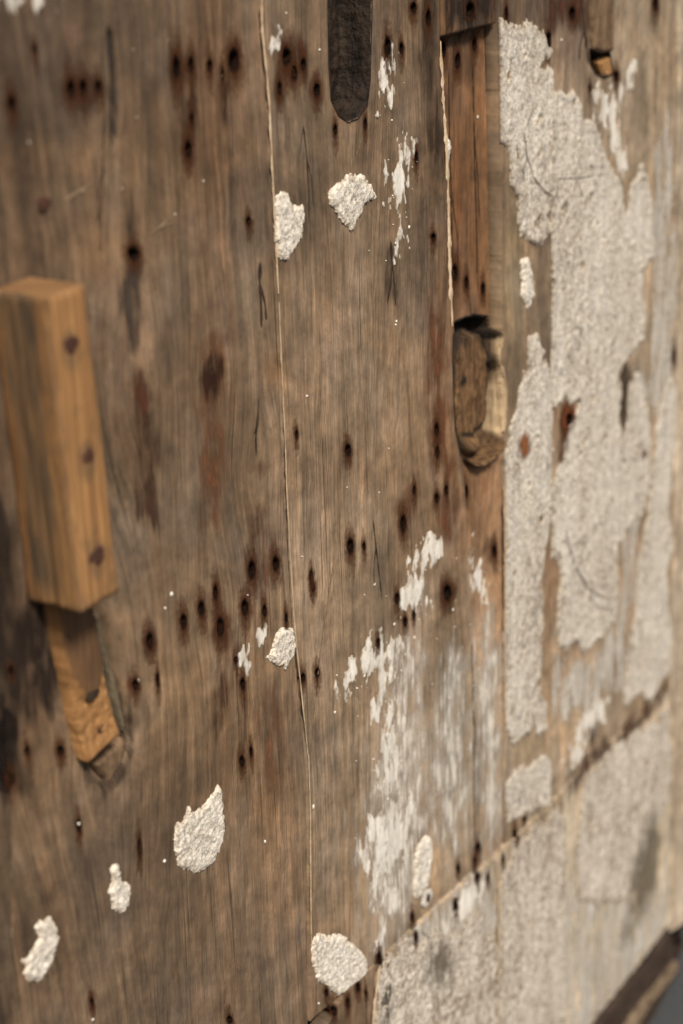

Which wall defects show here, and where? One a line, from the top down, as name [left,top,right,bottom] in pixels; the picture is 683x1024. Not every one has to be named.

rust [519,434,530,458]
rust [561,403,576,462]
peeling [311,17,683,1024]